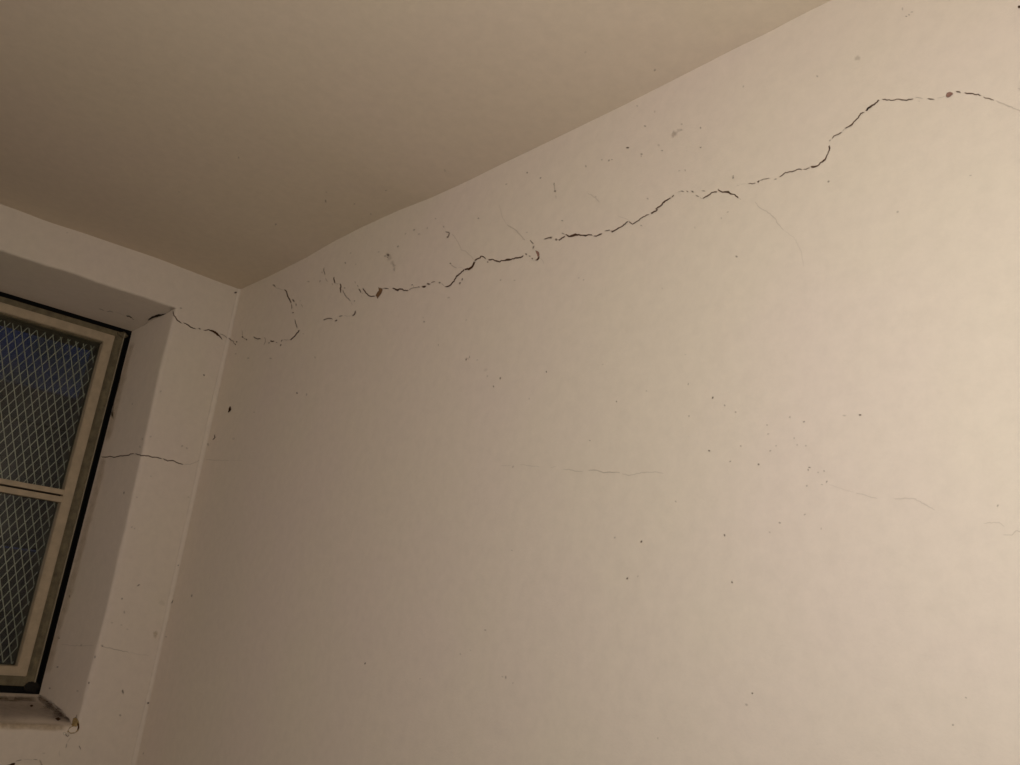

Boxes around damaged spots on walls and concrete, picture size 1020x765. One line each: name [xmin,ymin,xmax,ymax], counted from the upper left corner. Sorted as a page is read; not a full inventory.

crack [323,91,993,321]
crack [127,290,299,346]
crack [108,453,183,465]